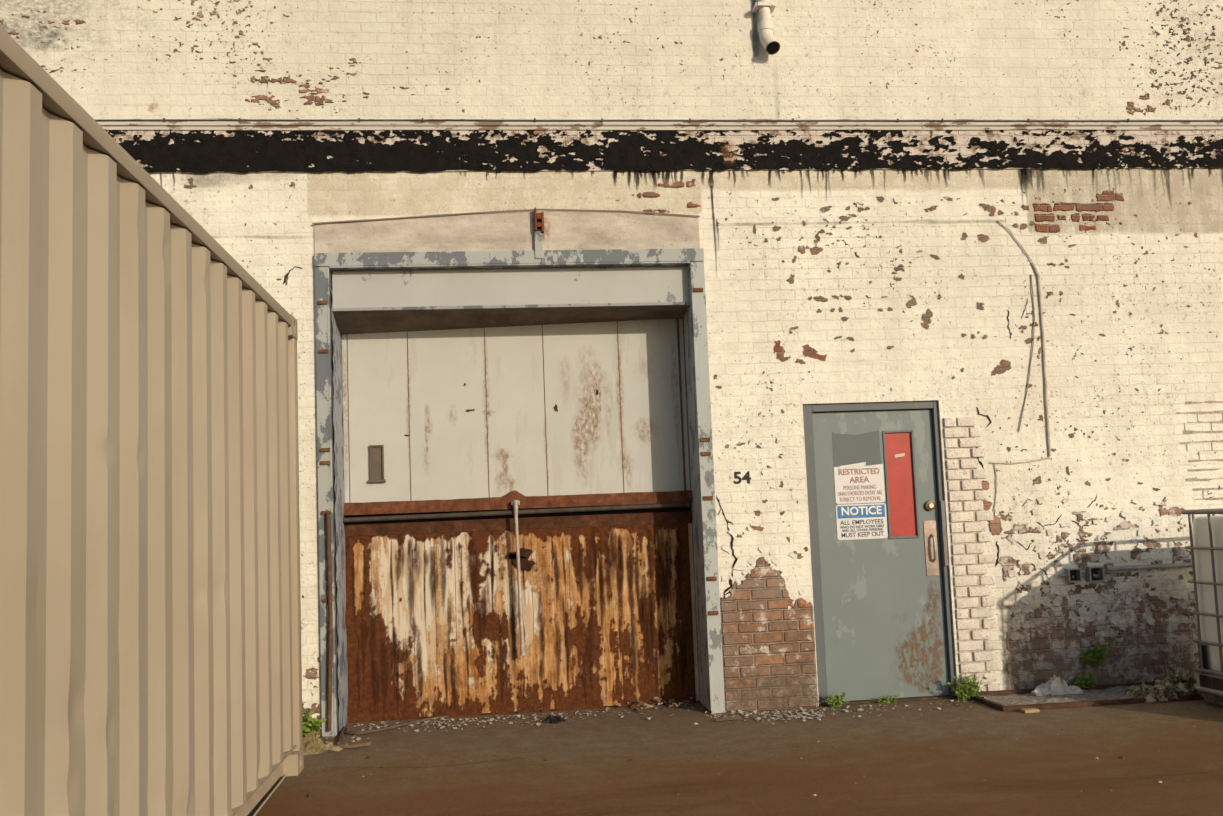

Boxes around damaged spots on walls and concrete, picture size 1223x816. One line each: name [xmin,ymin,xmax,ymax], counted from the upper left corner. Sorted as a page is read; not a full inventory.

peeling [0,10,108,73]
peeling [138,0,449,119]
peeling [1109,0,1223,118]
leakage [1017,168,1223,232]
peeling [716,191,960,335]
peeling [961,188,1223,690]
crack [716,496,738,599]
spalling [720,326,827,712]
peeling [302,656,321,736]
corrosion [344,523,696,723]
corrosion [900,589,942,689]